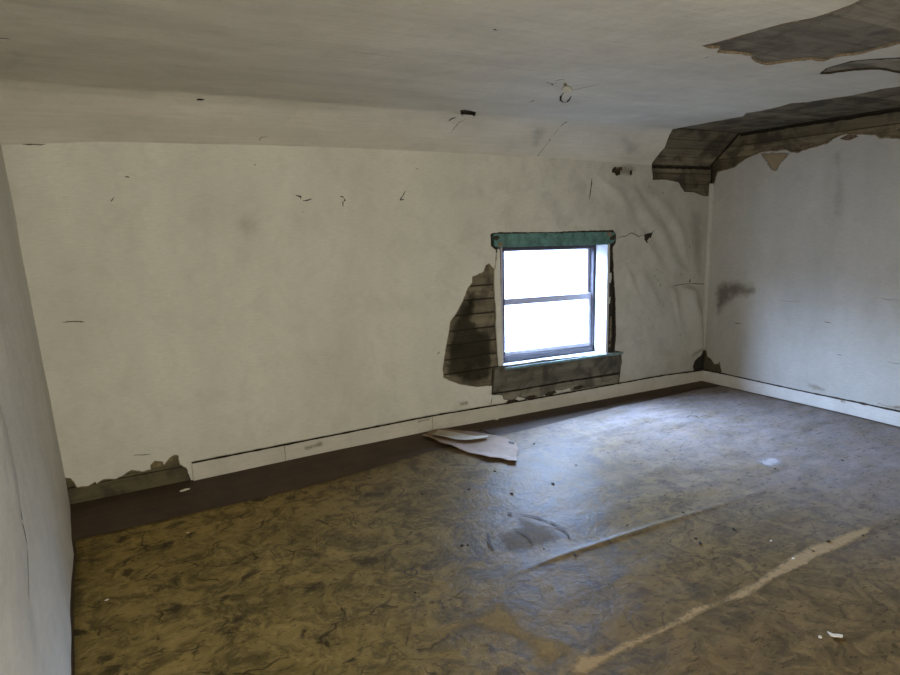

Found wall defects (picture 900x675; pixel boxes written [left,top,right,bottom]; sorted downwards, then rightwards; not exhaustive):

peeling [702,0,900,74]
crack [617,232,653,243]
peeling [443,258,497,387]
spalling [693,350,722,372]